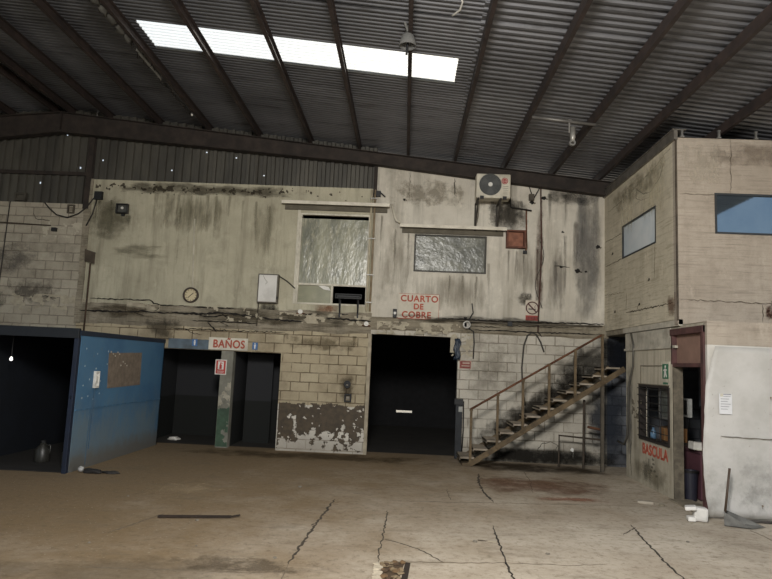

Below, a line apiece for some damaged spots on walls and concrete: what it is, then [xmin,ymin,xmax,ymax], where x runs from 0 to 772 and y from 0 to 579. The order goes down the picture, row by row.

leakage [96,183,293,198]
peeling [215,382,231,447]
peeling [276,402,365,453]
crack [287,499,335,564]
crack [377,511,604,579]
crack [624,525,685,579]